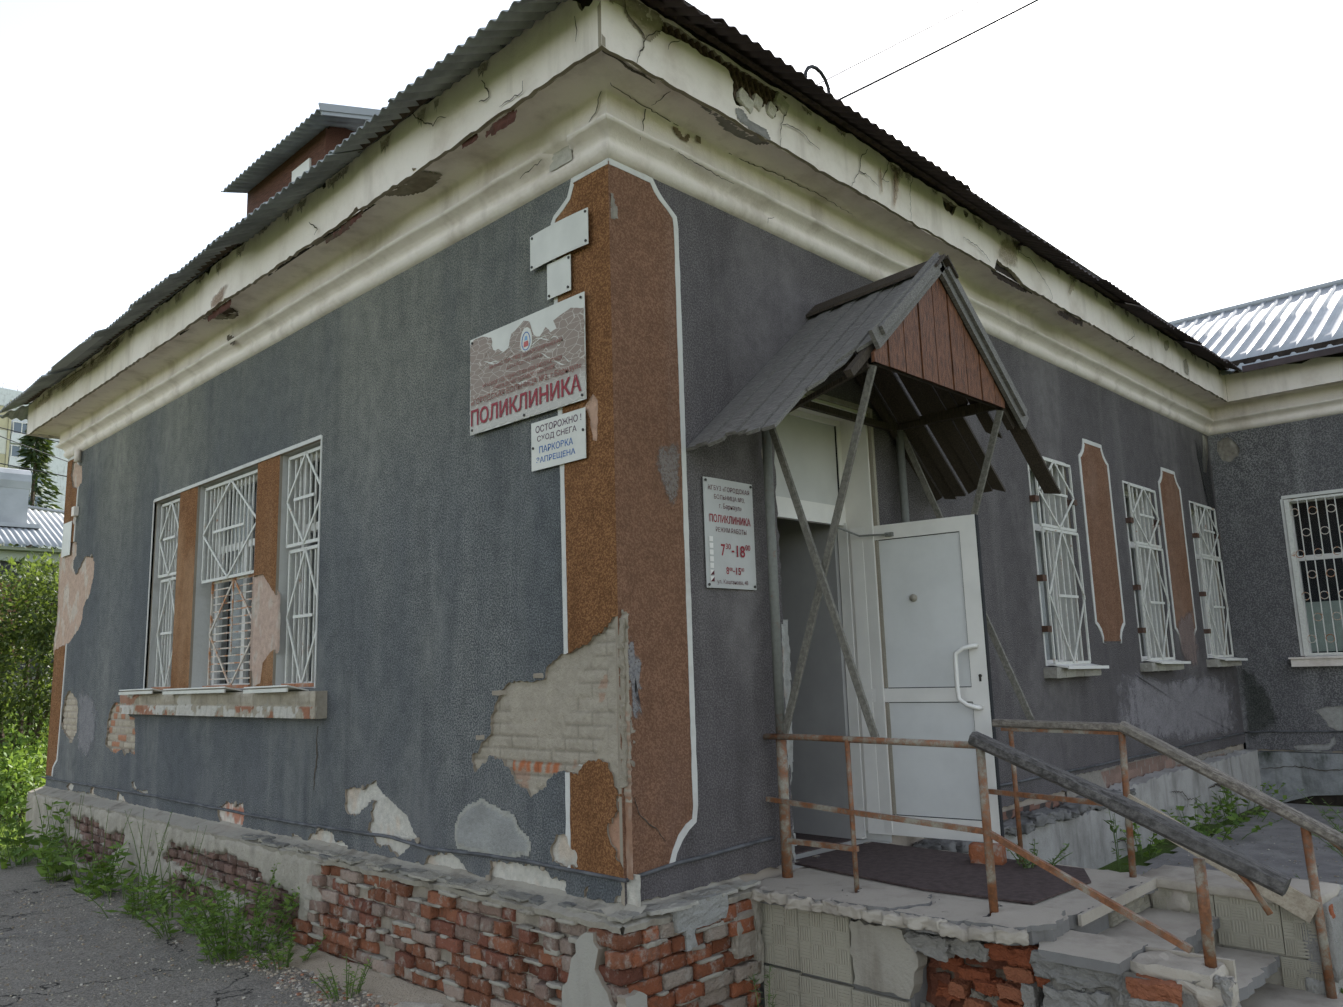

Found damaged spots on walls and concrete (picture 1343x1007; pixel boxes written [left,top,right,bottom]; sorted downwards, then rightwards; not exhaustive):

crack [574,0,913,215]
flaking render [386,168,442,197]
peeling [53,542,94,655]
flaking render [63,691,78,743]
flaking render [108,703,135,754]
damp [1119,613,1236,740]
flaking render [219,610,1029,946]
flaking render [64,816,125,867]
flaking render [163,842,299,938]